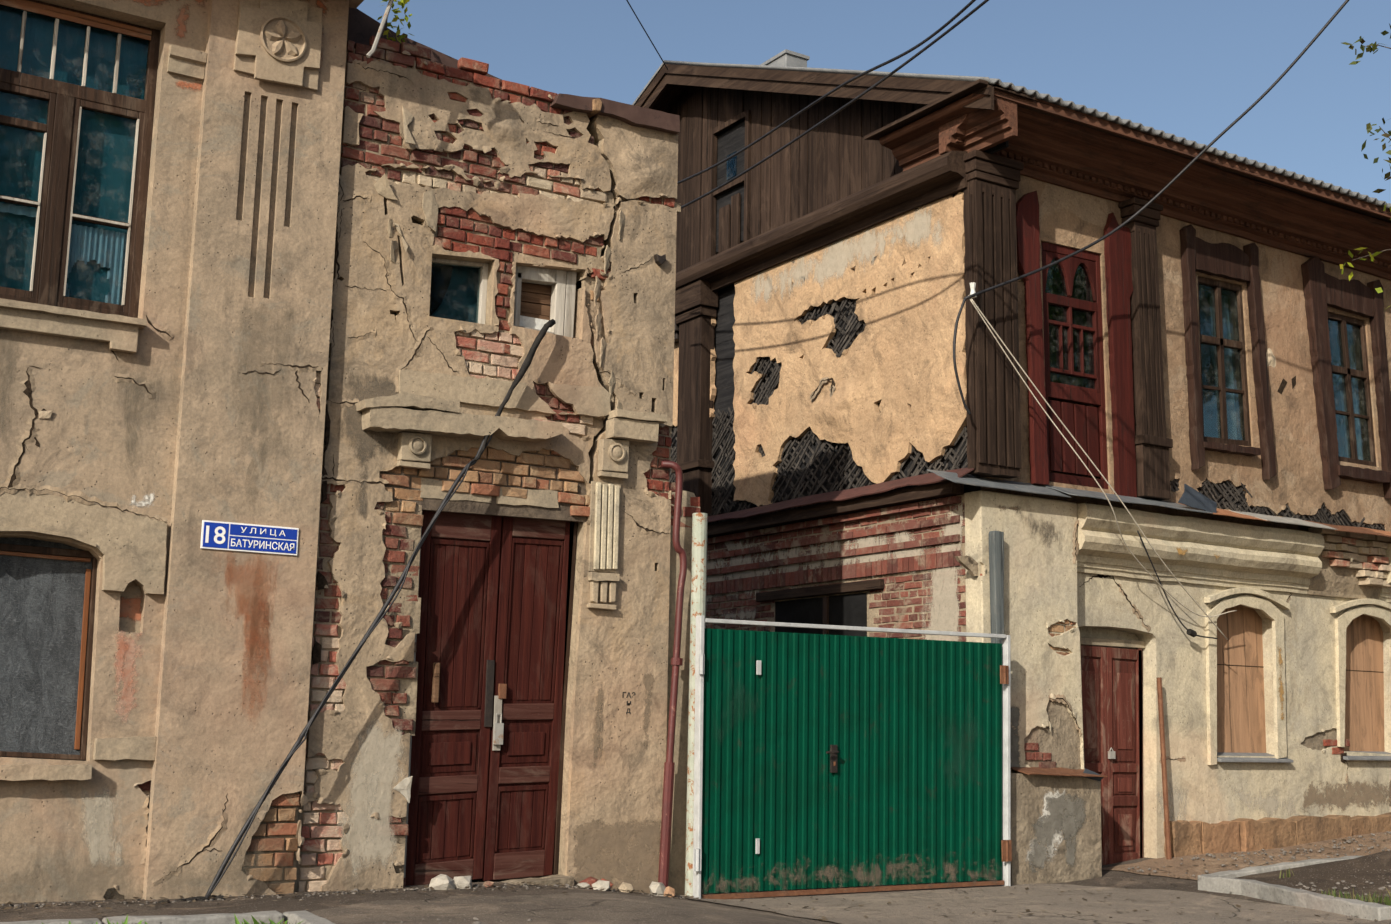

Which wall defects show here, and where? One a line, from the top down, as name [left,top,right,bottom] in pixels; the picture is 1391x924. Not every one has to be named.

spalling [340,36,681,381]
crack [0,366,167,522]
crack [111,350,156,399]
crack [243,174,458,504]
spalling [534,378,605,441]
crack [576,200,654,409]
crack [312,636,322,665]
crack [317,571,328,590]
spalling [308,484,347,716]
spalling [366,446,594,736]
spalling [1308,527,1391,587]
spalling [241,745,350,894]